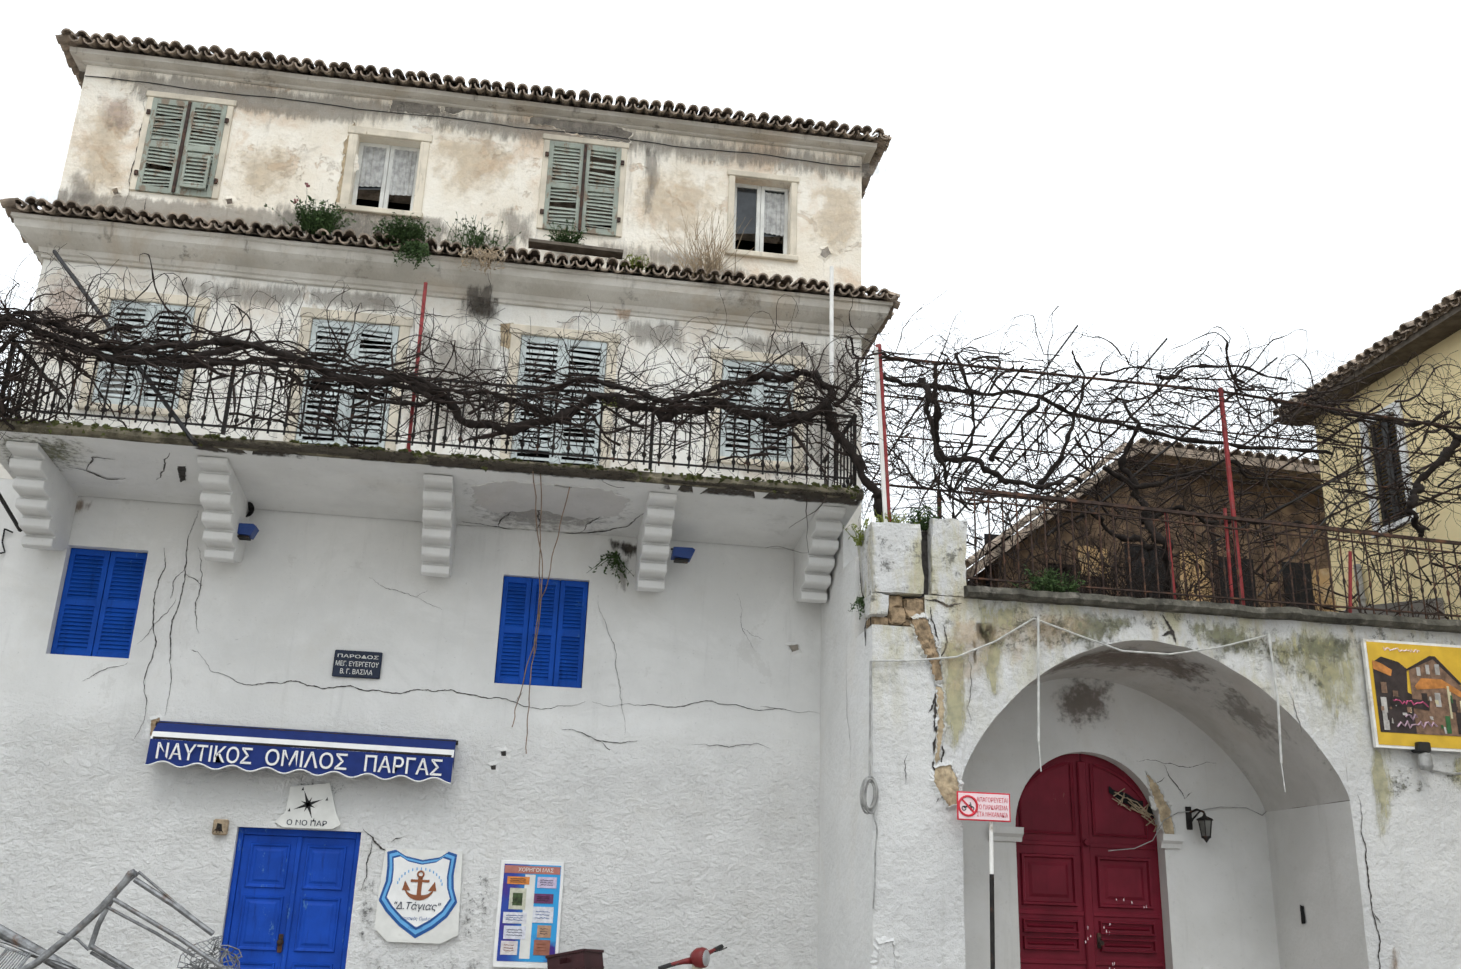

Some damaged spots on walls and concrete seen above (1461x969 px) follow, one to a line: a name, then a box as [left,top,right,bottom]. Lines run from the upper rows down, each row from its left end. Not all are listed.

leakage [463,285,498,317]
flaking render [470,480,631,520]
crack [85,517,851,779]
spalling [866,531,964,812]
crack [1358,797,1381,969]